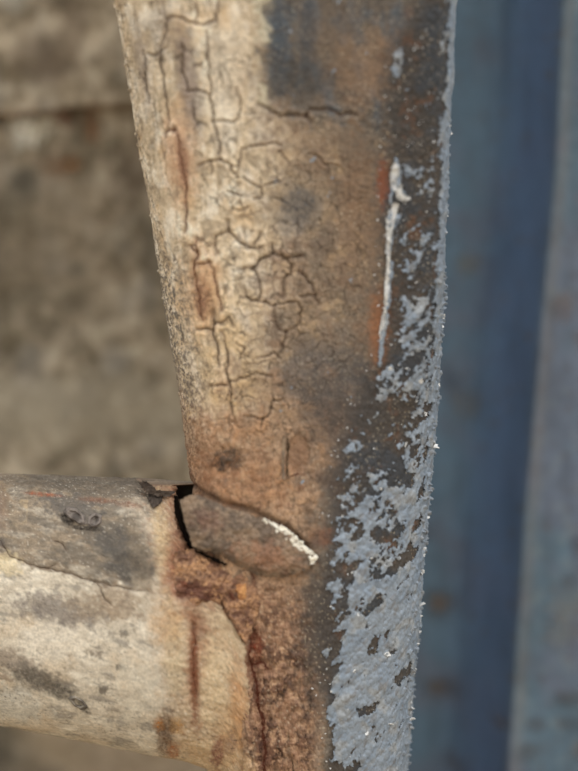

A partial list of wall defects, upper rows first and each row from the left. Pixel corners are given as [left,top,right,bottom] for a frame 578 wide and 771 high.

crack [144,4,355,426]
crack [174,494,227,566]
crack [0,540,147,601]
rust [229,583,247,601]